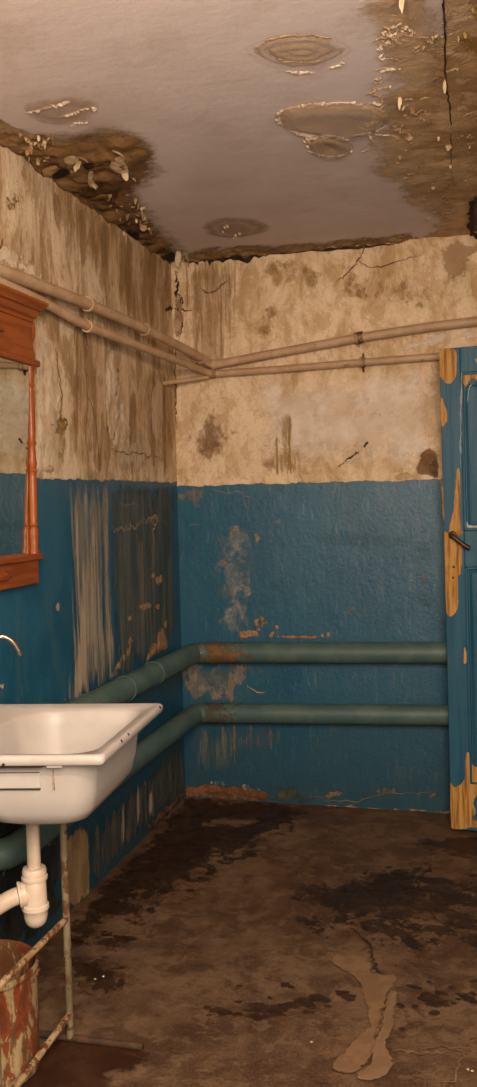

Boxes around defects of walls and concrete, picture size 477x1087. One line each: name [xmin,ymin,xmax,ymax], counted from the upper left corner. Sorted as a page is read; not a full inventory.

crack [433,0,453,179]
flaking render [467,197,477,236]
damp [65,484,175,700]
rust [200,642,247,663]
damp [290,867,477,950]
crack [348,927,476,1087]